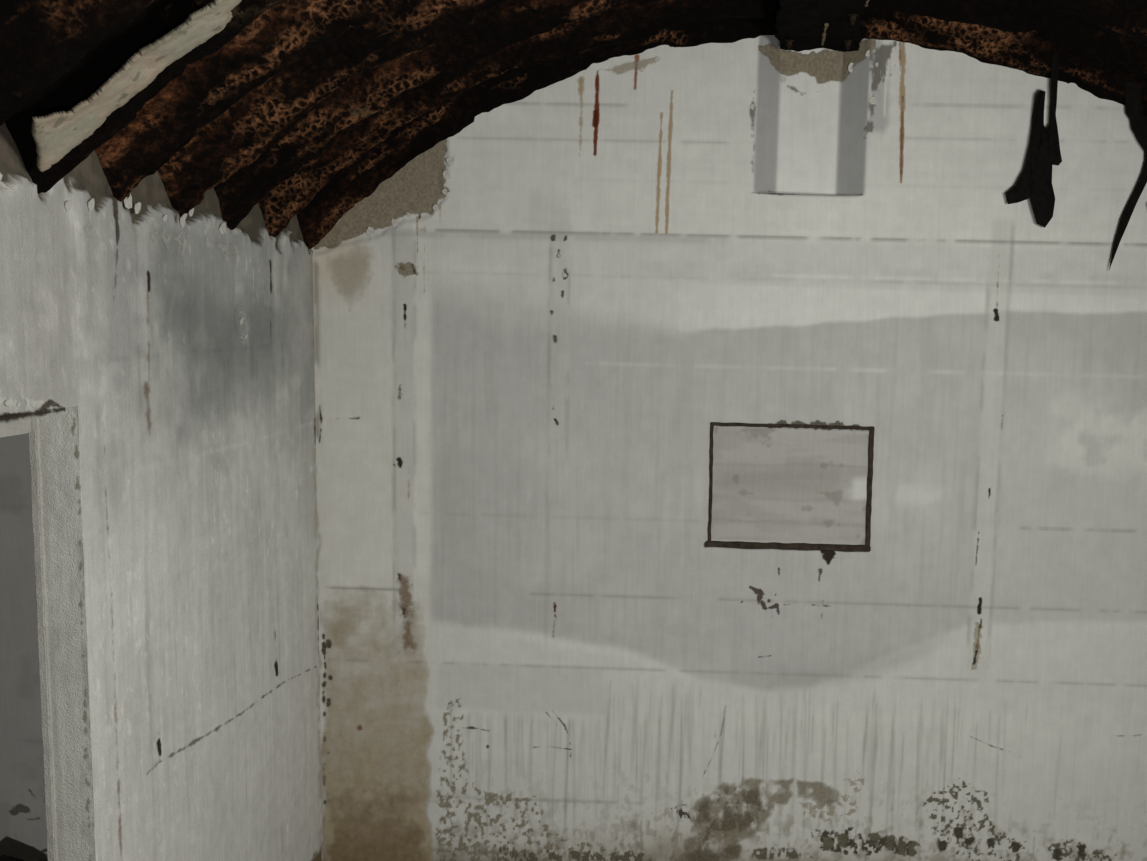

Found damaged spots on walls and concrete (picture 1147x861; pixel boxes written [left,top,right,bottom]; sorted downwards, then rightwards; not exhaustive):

spalling [31,0,241,172]
spalling [314,139,455,249]
corrosion [579,71,599,155]
corrosion [656,91,673,234]
spalling [759,39,896,132]
spalling [396,262,418,277]
damp [768,420,869,431]
damp [819,550,836,581]
crack [157,634,283,757]
crack [307,605,332,820]
damp [312,682,431,861]
damp [681,779,864,861]